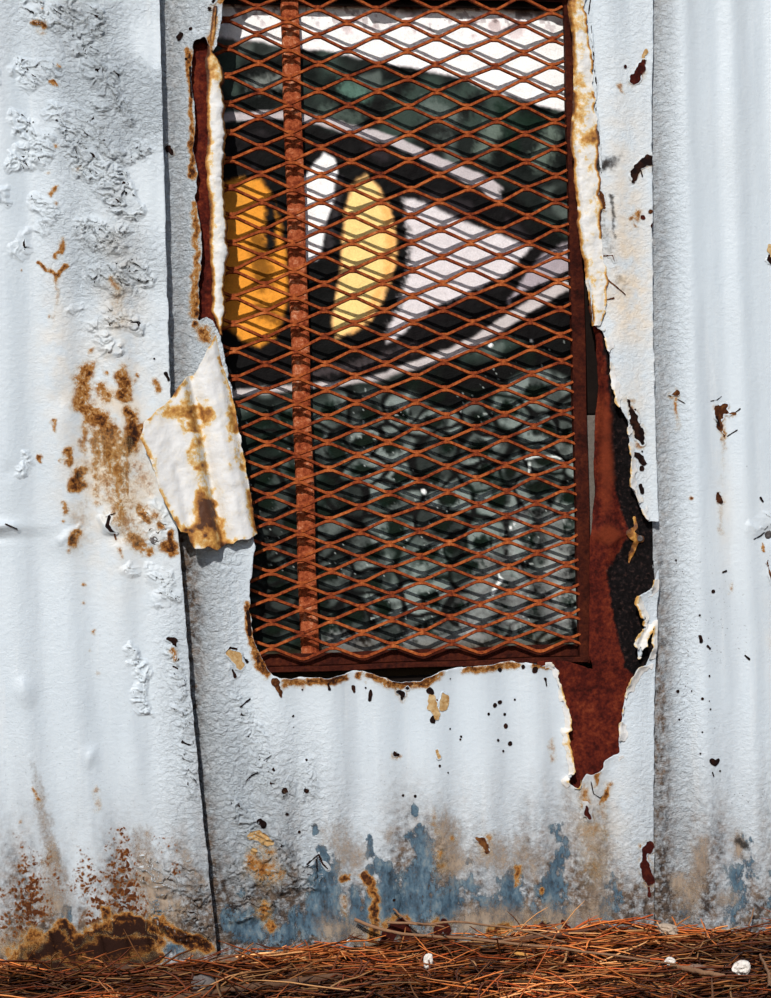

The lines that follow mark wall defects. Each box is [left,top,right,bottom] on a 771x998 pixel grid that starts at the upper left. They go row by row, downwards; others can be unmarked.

peeling [617,49,648,93]
peeling [628,154,653,184]
peeling [599,188,607,212]
corrosion [58,348,179,557]
peeling [627,397,647,471]
corrosion [626,516,644,563]
peeling [225,647,249,678]
peeling [426,687,449,723]
leakage [735,834,749,857]
corrosion [0,827,215,971]
leakage [457,827,604,933]
leakage [323,922,366,941]